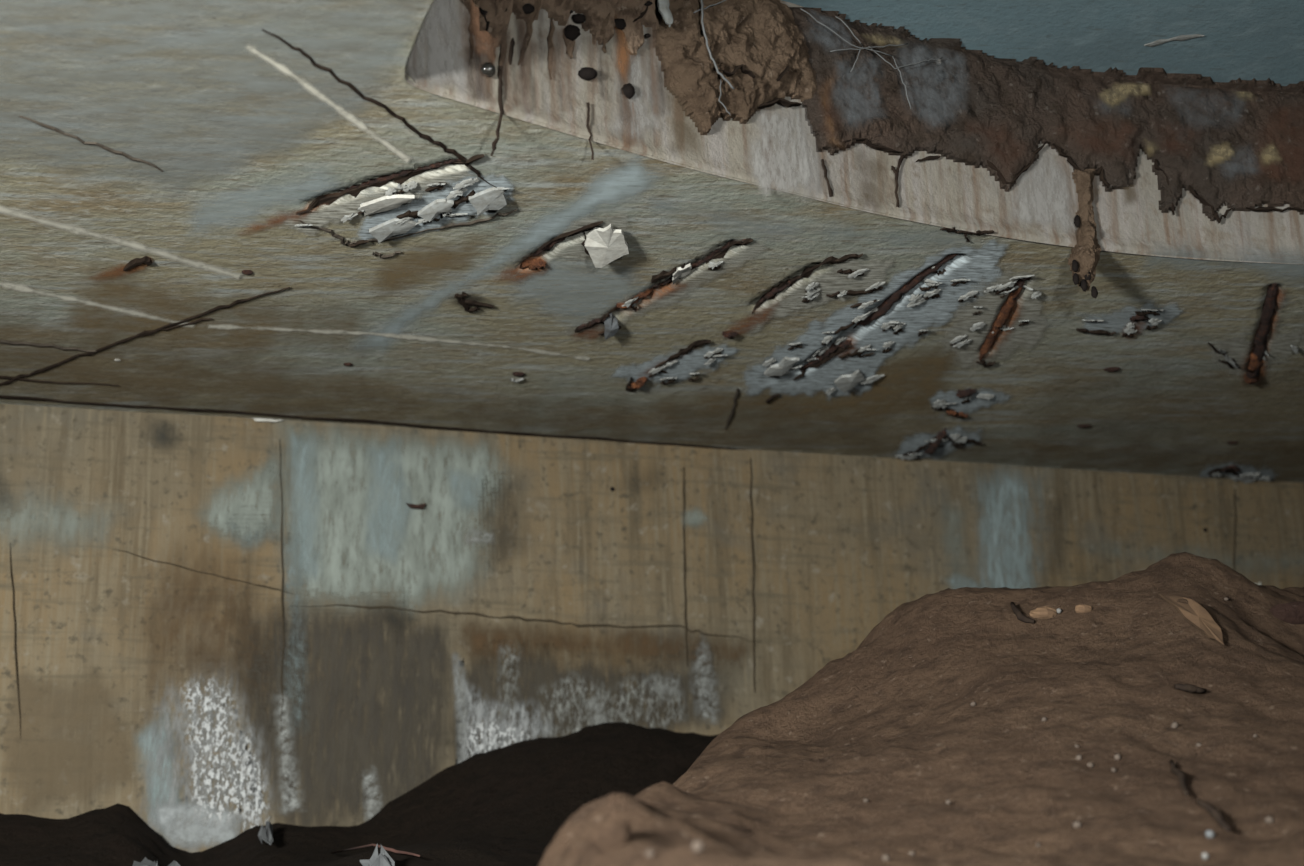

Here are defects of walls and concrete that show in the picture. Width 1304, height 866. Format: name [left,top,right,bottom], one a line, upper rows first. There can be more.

corrosion [473,3,491,52]
spalling [563,10,586,41]
spalling [614,19,626,30]
peeling [644,0,673,27]
crack [262,29,517,258]
spalling [253,154,513,247]
spalling [505,216,629,278]
spalling [575,238,764,340]
spalling [613,240,1046,404]
spalling [895,388,1009,461]
crack [0,287,762,739]
damp [141,430,744,845]